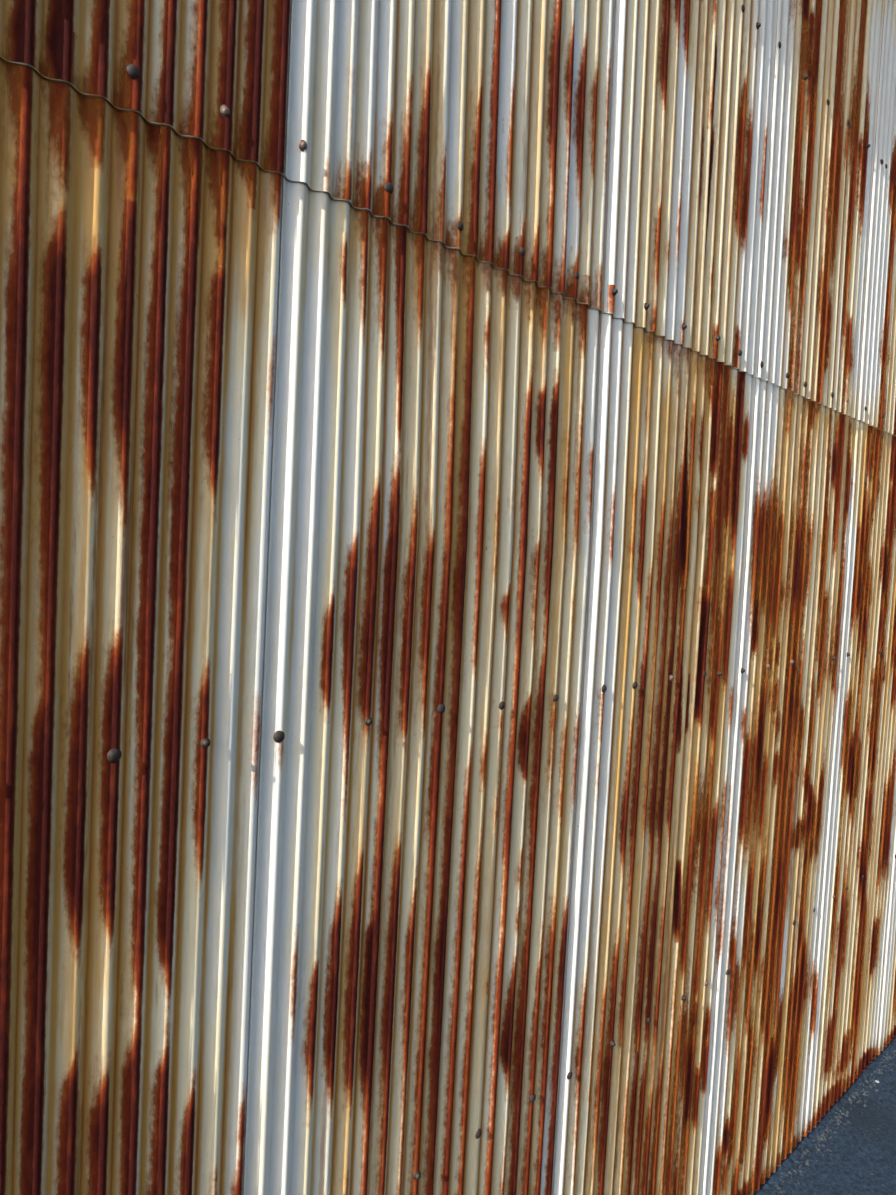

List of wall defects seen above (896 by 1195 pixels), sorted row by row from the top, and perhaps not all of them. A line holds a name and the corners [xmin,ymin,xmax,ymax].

corrosion [0,0,290,1195]
corrosion [291,0,615,1195]
corrosion [573,0,896,1195]